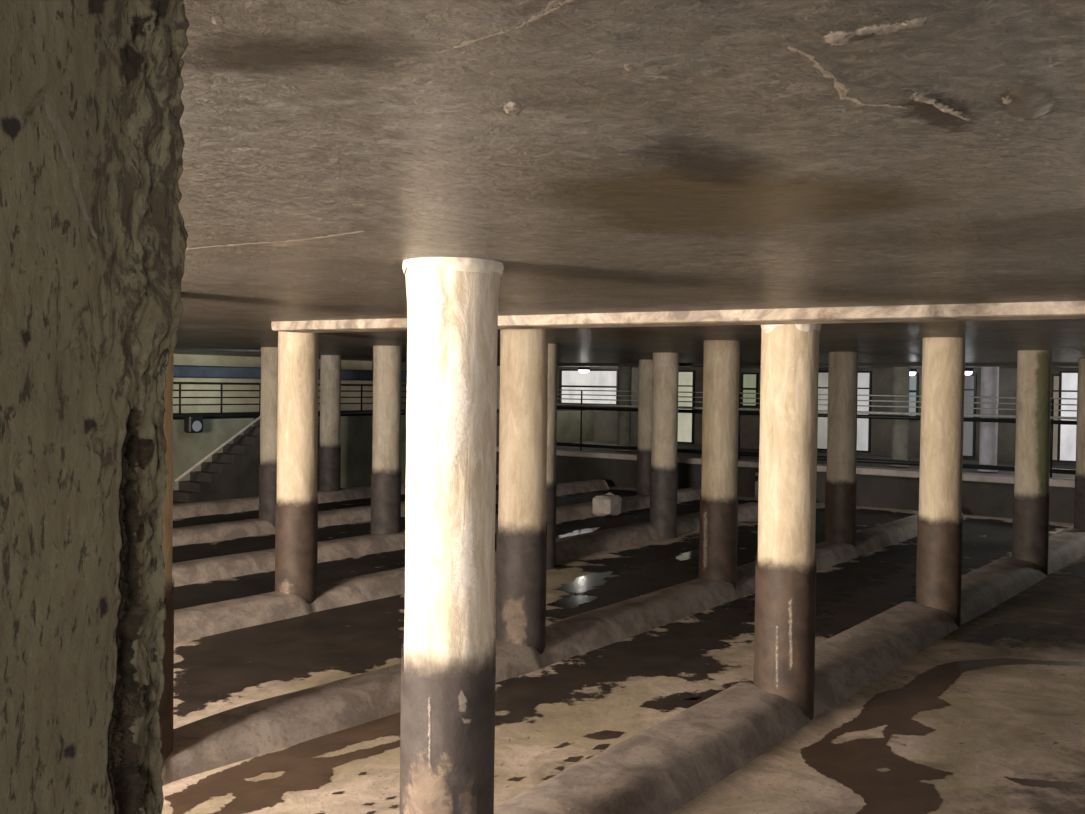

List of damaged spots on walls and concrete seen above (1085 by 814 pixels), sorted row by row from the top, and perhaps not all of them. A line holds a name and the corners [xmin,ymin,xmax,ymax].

spalling [824,17,927,46]
crack [787,46,906,109]
spalling [901,90,979,133]
spalling [100,407,154,814]
damp [159,445,1085,814]